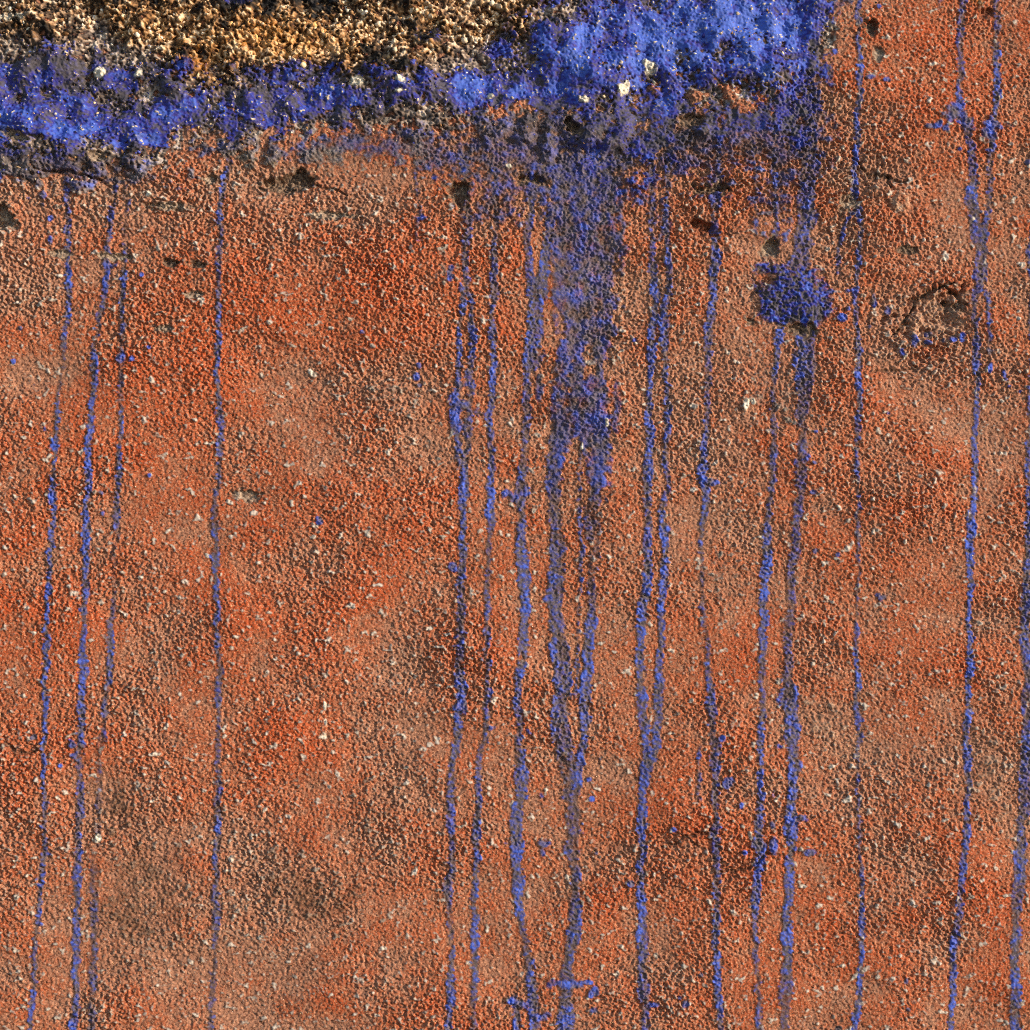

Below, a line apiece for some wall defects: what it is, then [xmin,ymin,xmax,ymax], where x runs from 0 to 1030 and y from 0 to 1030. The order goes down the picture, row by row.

crack [891,282,968,337]